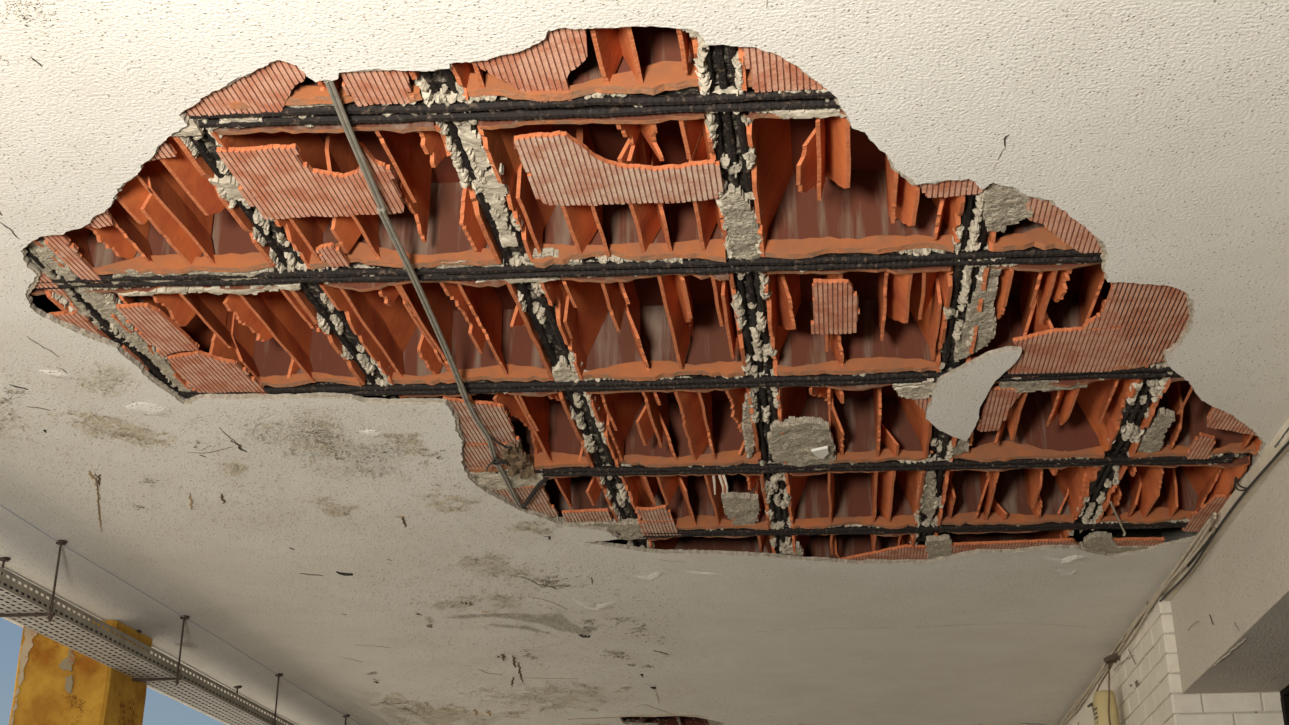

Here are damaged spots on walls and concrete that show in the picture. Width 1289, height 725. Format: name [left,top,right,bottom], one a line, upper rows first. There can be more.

flaking render [886,154,942,186]
flaking render [294,392,686,552]
peeling [811,446,829,459]
flaking render [1235,427,1289,490]
flaking render [712,551,917,563]
peeling [14,627,100,698]